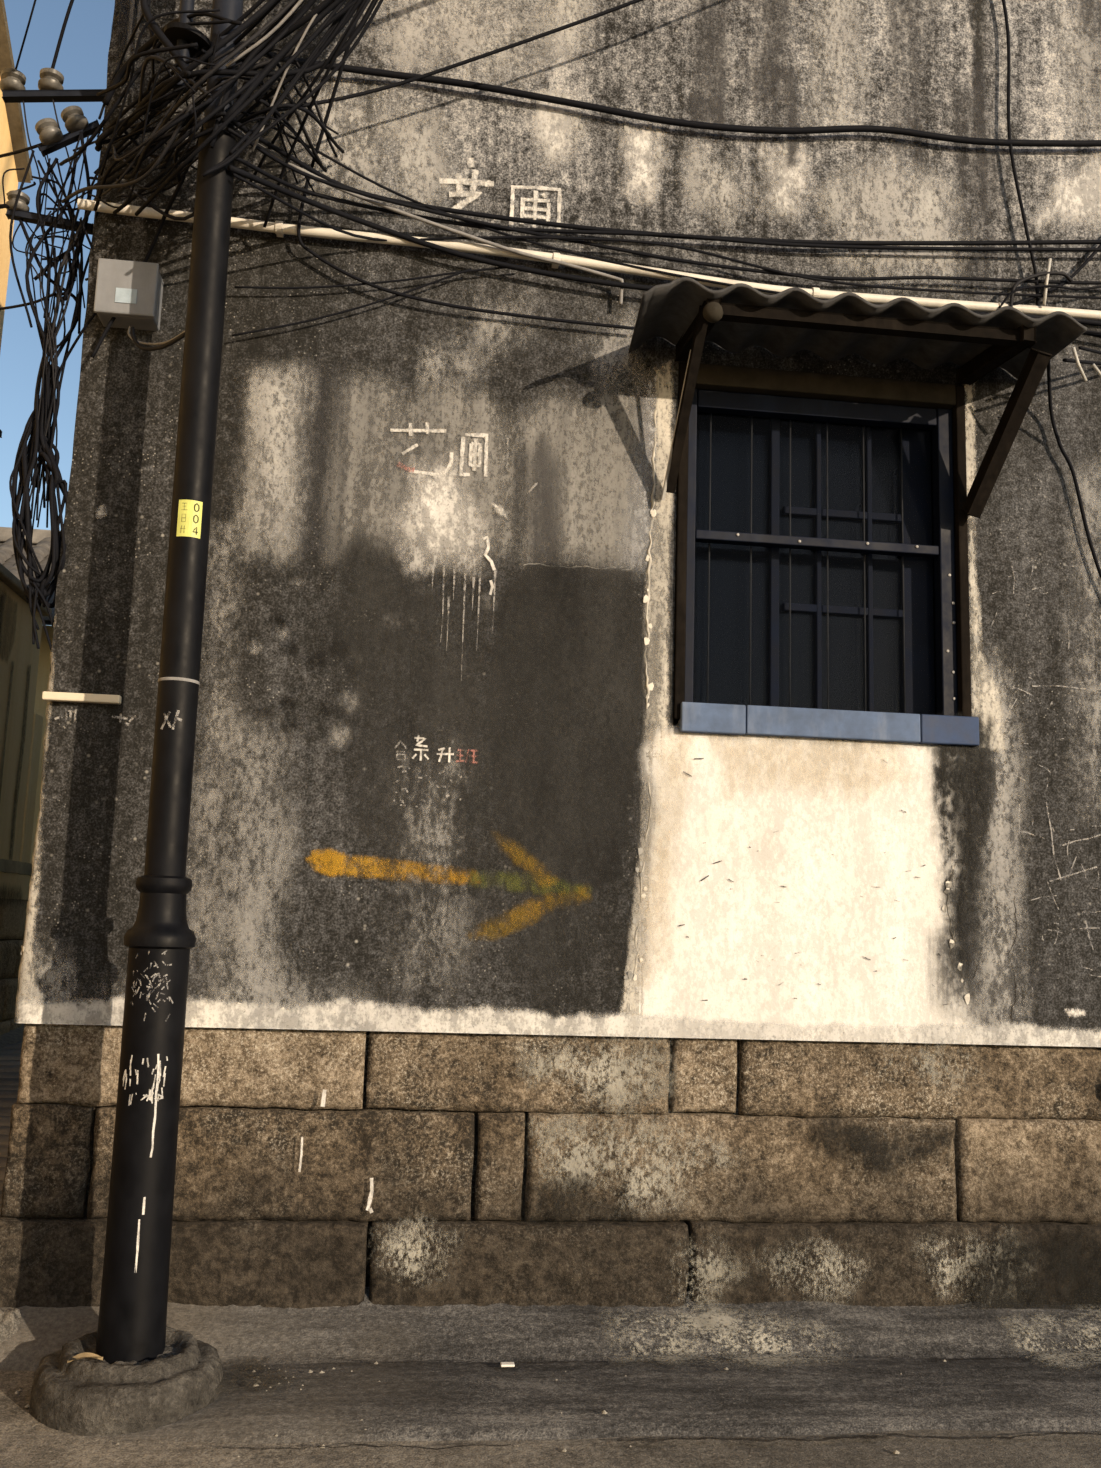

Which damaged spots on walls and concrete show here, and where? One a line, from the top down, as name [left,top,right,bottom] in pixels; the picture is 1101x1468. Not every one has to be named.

water stain [380,0,587,77]
water stain [690,0,727,136]
water stain [756,0,863,163]
water stain [1059,0,1101,121]